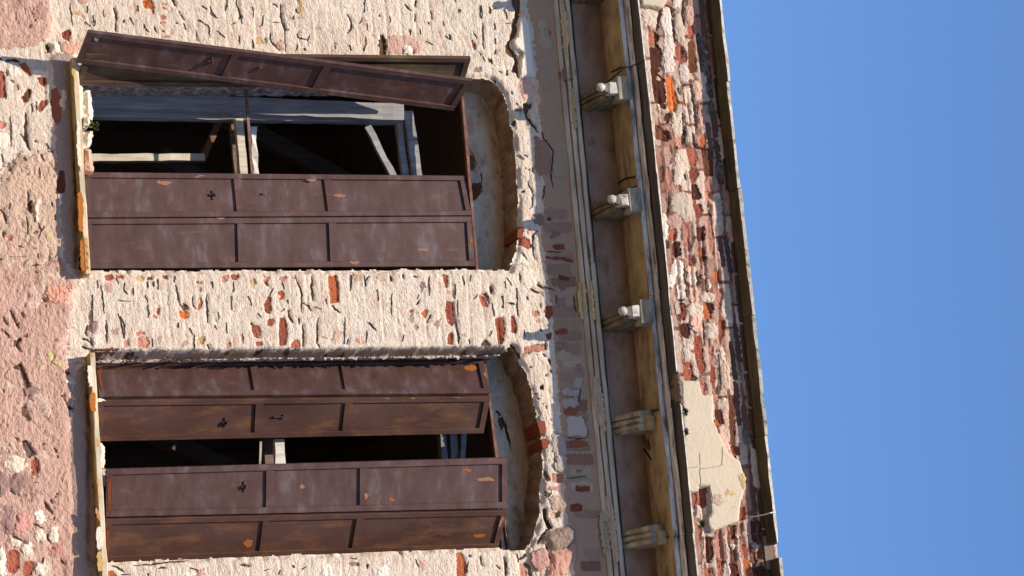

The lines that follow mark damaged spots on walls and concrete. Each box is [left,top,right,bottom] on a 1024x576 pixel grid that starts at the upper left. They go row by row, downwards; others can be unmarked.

flaking render [504,227,532,249]
flaking render [546,244,573,263]
flaking render [531,306,553,323]
flaking render [521,328,568,358]
flaking render [524,421,549,456]
flaking render [570,485,590,511]